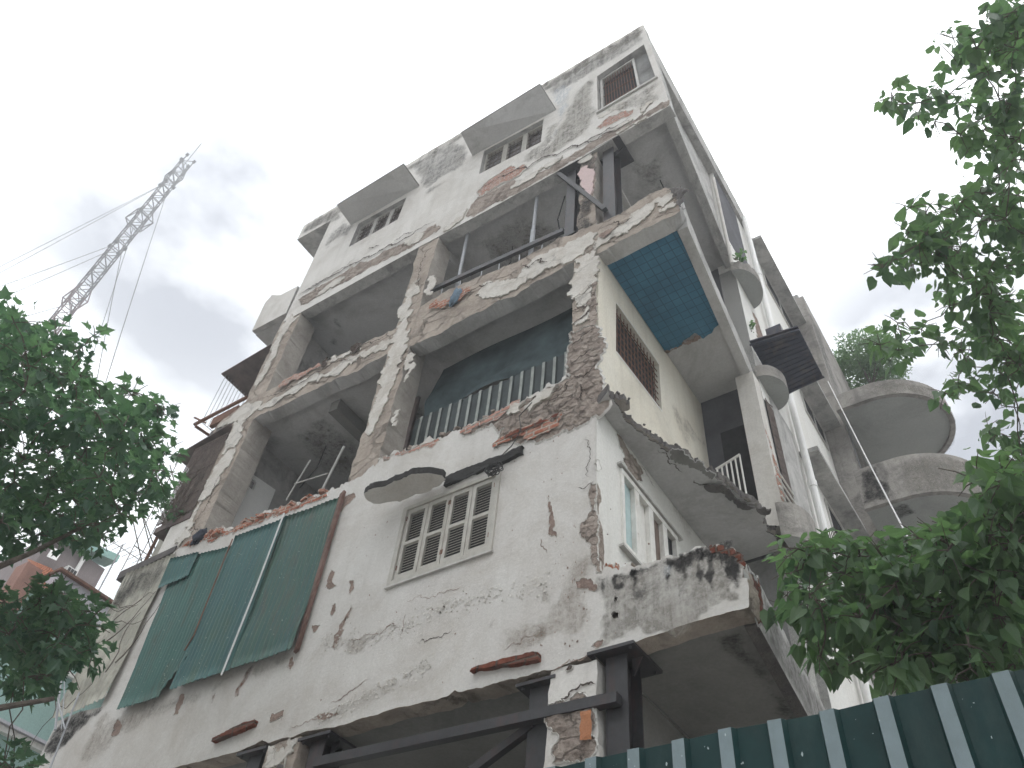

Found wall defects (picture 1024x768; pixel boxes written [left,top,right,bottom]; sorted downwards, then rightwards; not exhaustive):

peeling [466,100,670,217]
flaking render [174,186,758,548]
crack [354,585,466,642]
flaking render [311,440,626,662]
damp [599,541,739,636]
peeling [314,652,434,729]
flaking render [544,692,598,767]
crack [554,650,594,703]